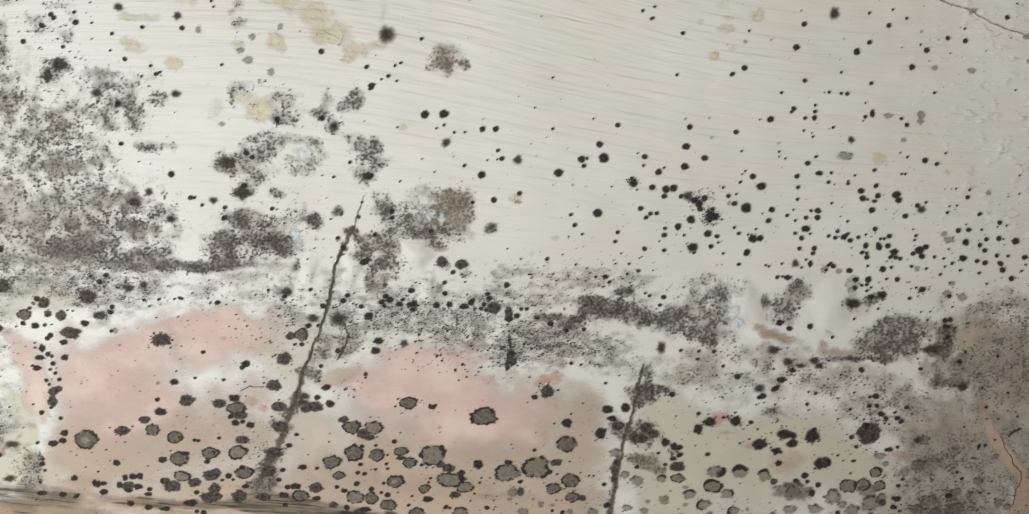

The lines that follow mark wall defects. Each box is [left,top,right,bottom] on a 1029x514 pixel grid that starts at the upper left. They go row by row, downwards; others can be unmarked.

crack [932,0,1029,42]
leakage [134,136,175,163]
leakage [421,110,466,167]
leakage [578,141,608,168]
leakage [722,170,766,213]
leakage [846,174,902,213]
leakage [733,207,776,266]
crack [245,196,364,493]
crack [606,364,644,514]